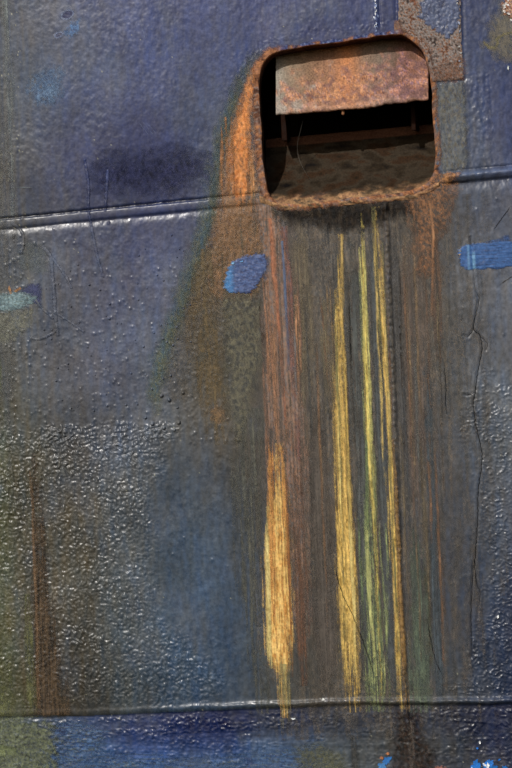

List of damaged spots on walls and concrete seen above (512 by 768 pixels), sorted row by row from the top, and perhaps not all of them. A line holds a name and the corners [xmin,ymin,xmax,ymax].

corrosion [150,69,310,603]
crack [463,270,488,652]
peeling [471,759,508,768]